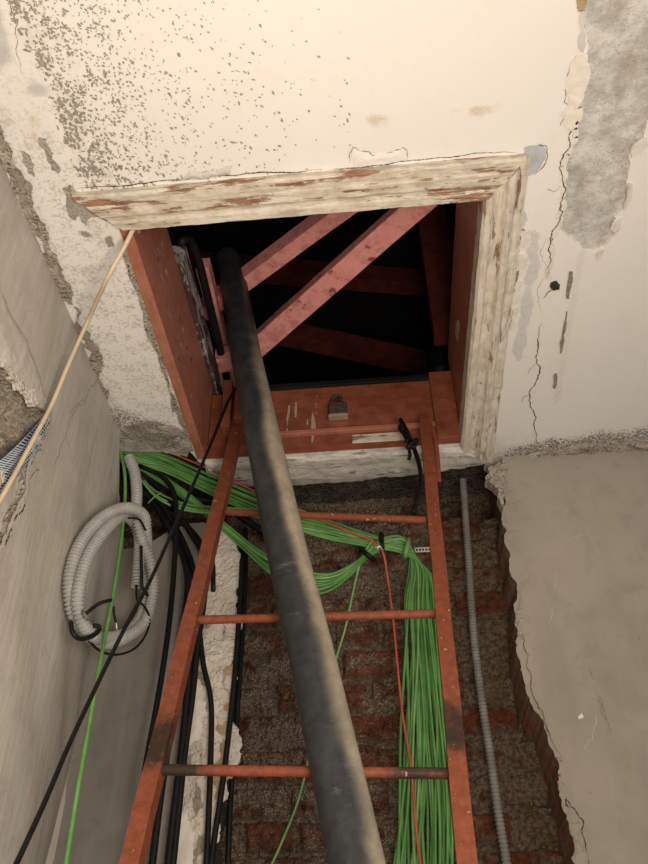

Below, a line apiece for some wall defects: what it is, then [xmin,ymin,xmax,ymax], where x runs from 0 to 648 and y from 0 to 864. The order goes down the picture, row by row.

peeling [6,0,309,226]
peeling [320,144,476,170]
peeling [510,144,548,176]
flaking render [559,0,648,261]
peeling [509,211,539,360]
crack [521,56,583,444]
spalling [543,271,573,299]
spalling [560,311,568,354]
flaking render [0,356,46,459]
flaking render [484,461,508,513]
flaking render [515,593,524,639]
flaking render [557,769,589,864]